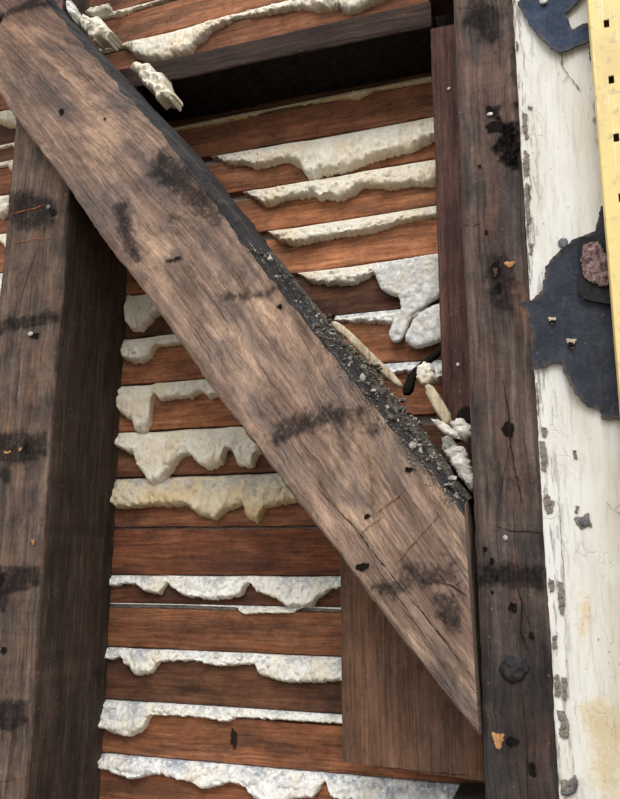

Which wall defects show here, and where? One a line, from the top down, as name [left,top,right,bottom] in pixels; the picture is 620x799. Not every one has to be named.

peeling [539,427,548,473]
peeling [543,494,555,514]
crack [318,488,474,681]
peeling [548,578,566,615]
peeling [553,674,568,701]
peeling [557,710,569,739]
peeling [560,775,578,793]